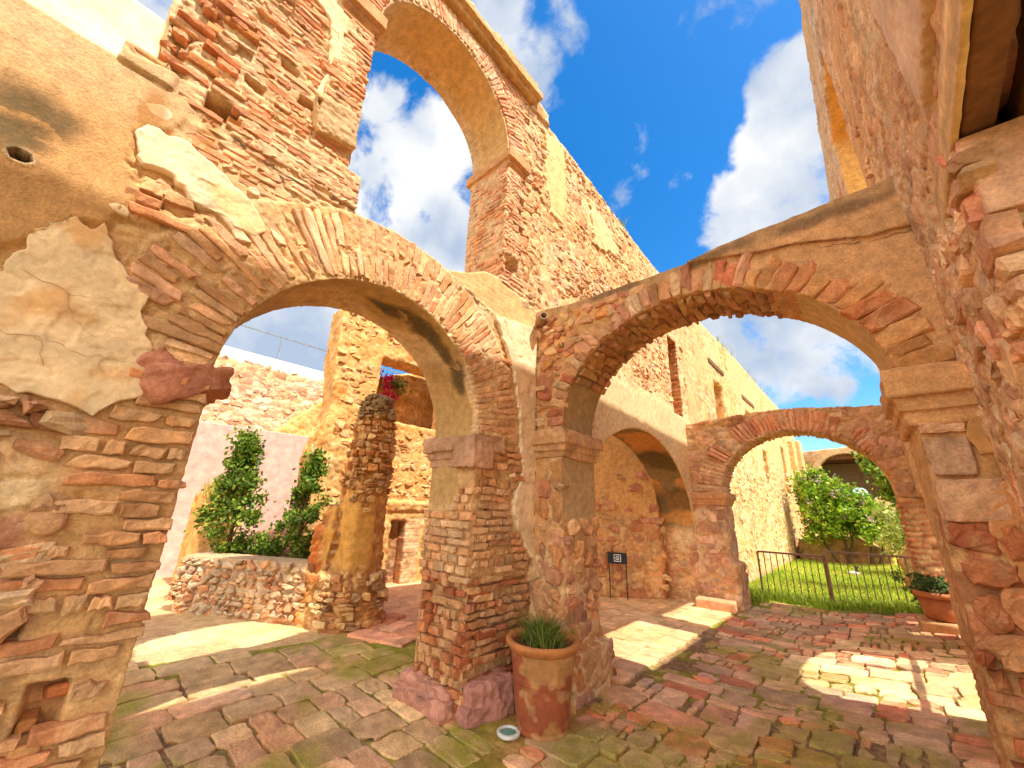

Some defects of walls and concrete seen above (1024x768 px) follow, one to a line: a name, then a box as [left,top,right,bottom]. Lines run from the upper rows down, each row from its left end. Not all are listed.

peeling [109,203,130,218]
crack [0,269,135,366]
peeling [0,216,153,416]